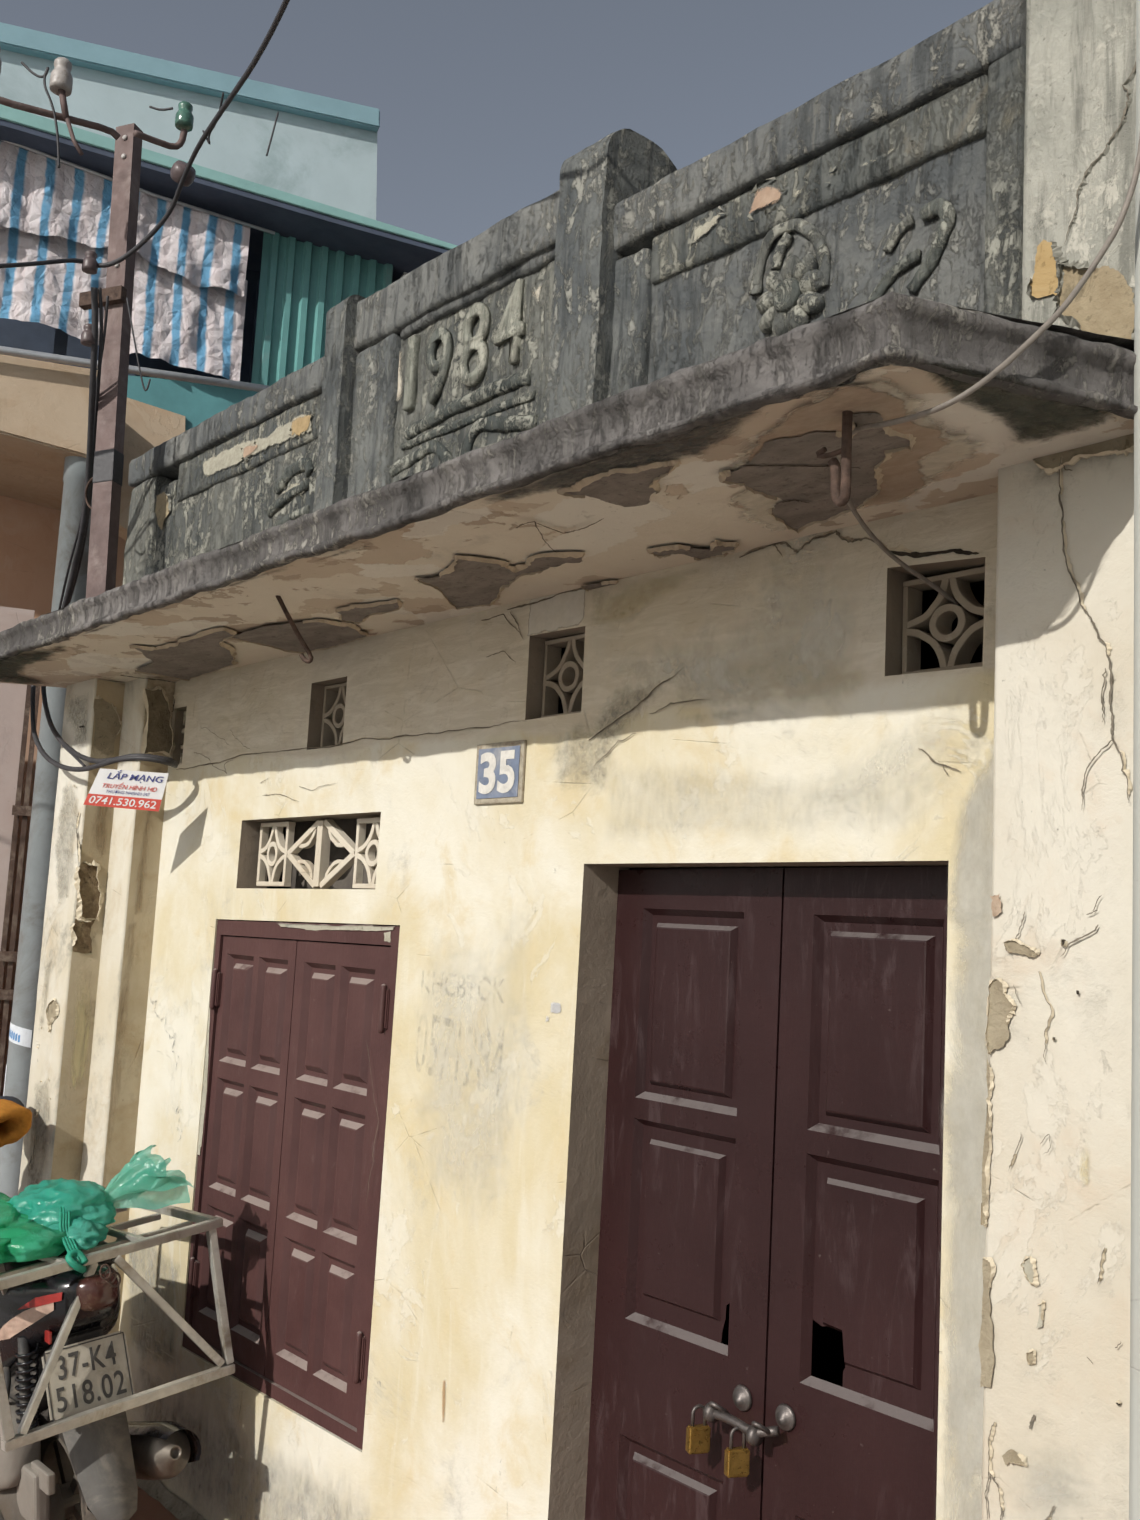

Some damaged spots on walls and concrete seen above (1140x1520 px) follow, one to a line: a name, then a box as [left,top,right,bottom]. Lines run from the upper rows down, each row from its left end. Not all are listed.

peeling [747,165,837,221]
crack [1064,62,1136,244]
flaking render [1026,239,1135,340]
peeling [203,411,312,476]
flaking render [557,460,682,507]
flaking render [129,599,403,757]
crack [120,675,512,802]
flaking render [414,552,585,610]
crack [588,667,705,766]
crack [1058,457,1132,805]
spalling [57,785,104,954]
flaking render [981,978,1016,1228]